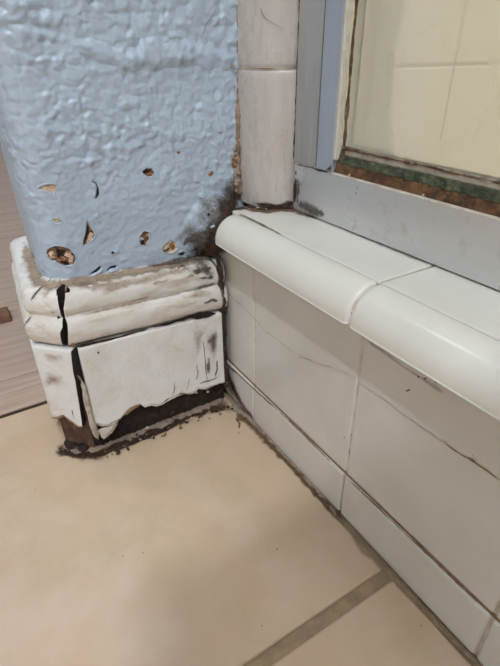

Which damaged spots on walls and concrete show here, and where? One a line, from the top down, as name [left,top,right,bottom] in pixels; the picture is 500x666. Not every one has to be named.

peeling [140,167,155,179]
peeling [35,183,58,196]
peeling [43,245,78,267]
peeling [81,218,97,247]
peeling [138,230,151,247]
water stain [22,175,280,306]
peeling [161,239,179,255]
crack [56,284,75,347]
crack [228,294,500,481]
peeling [81,379,118,439]